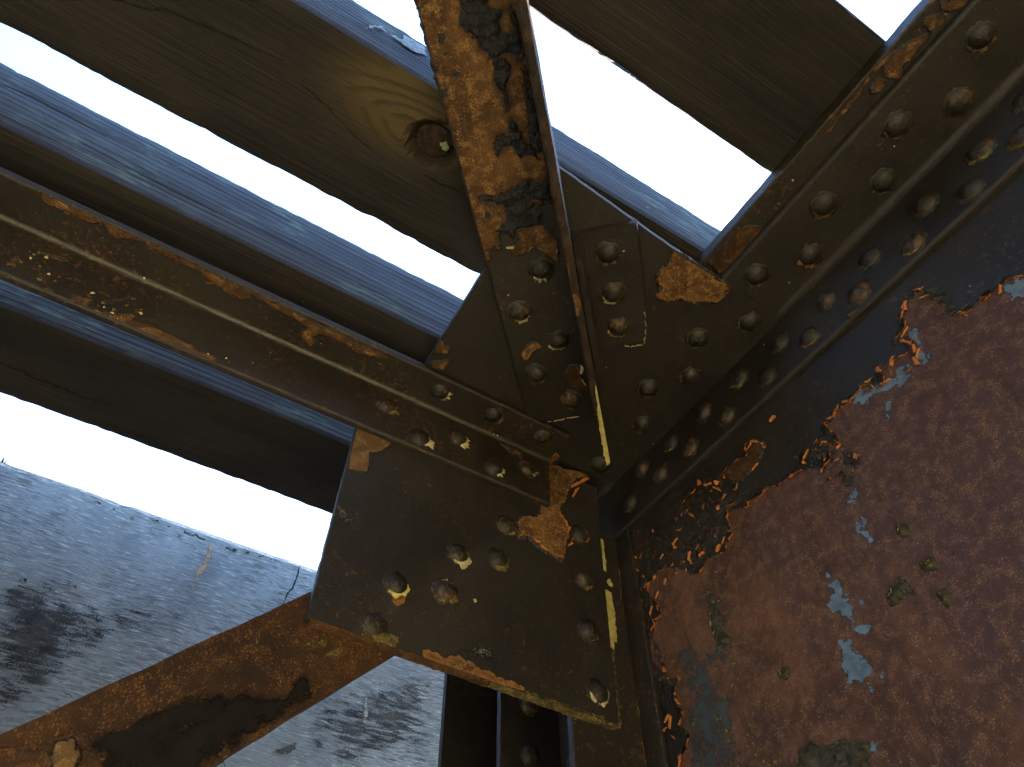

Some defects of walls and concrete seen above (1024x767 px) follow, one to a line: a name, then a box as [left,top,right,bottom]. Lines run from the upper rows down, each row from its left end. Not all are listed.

rust [414,0,581,317]
rust [38,191,389,364]
rust [654,225,762,305]
rust [347,428,391,474]
rust [516,451,590,563]
peeling [796,441,860,487]
rust [646,270,1024,767]
peeling [631,473,750,740]
peeling [797,738,872,767]